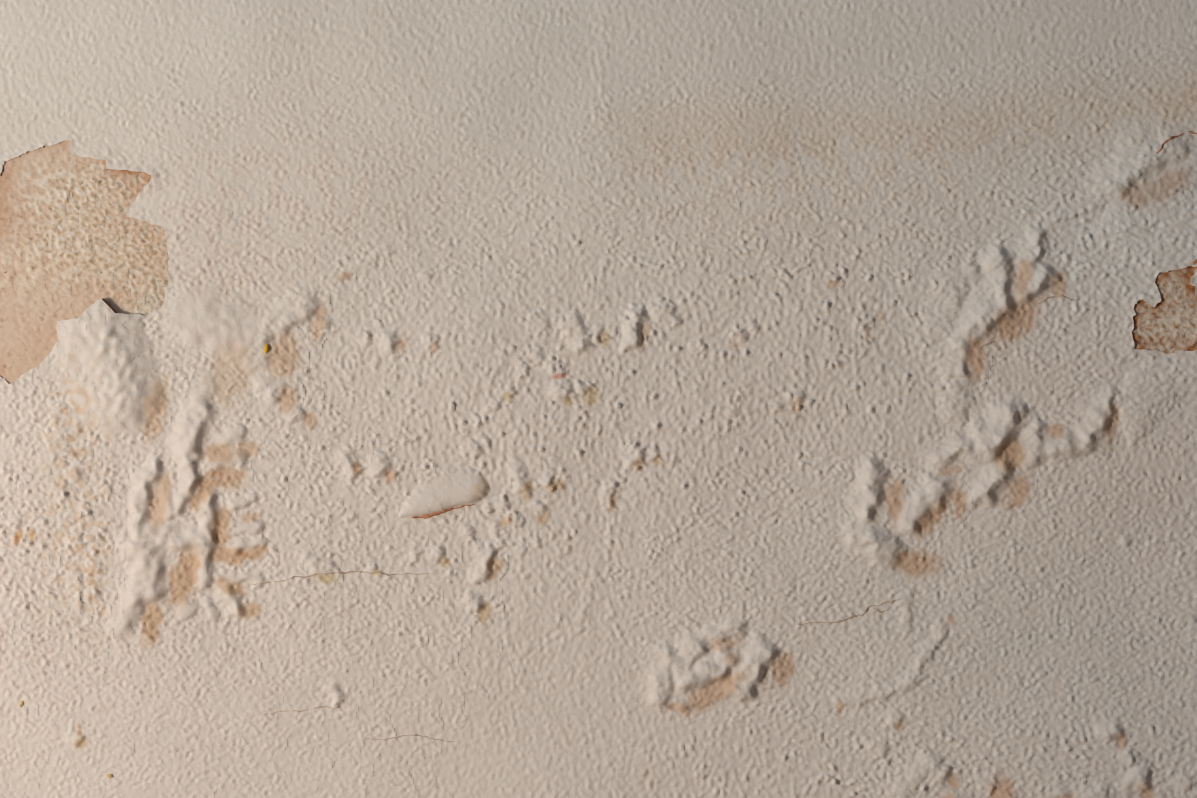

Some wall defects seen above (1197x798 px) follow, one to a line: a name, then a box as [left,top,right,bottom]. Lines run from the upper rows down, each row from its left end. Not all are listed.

peeling [0,128,172,384]
peeling [1132,266,1197,354]